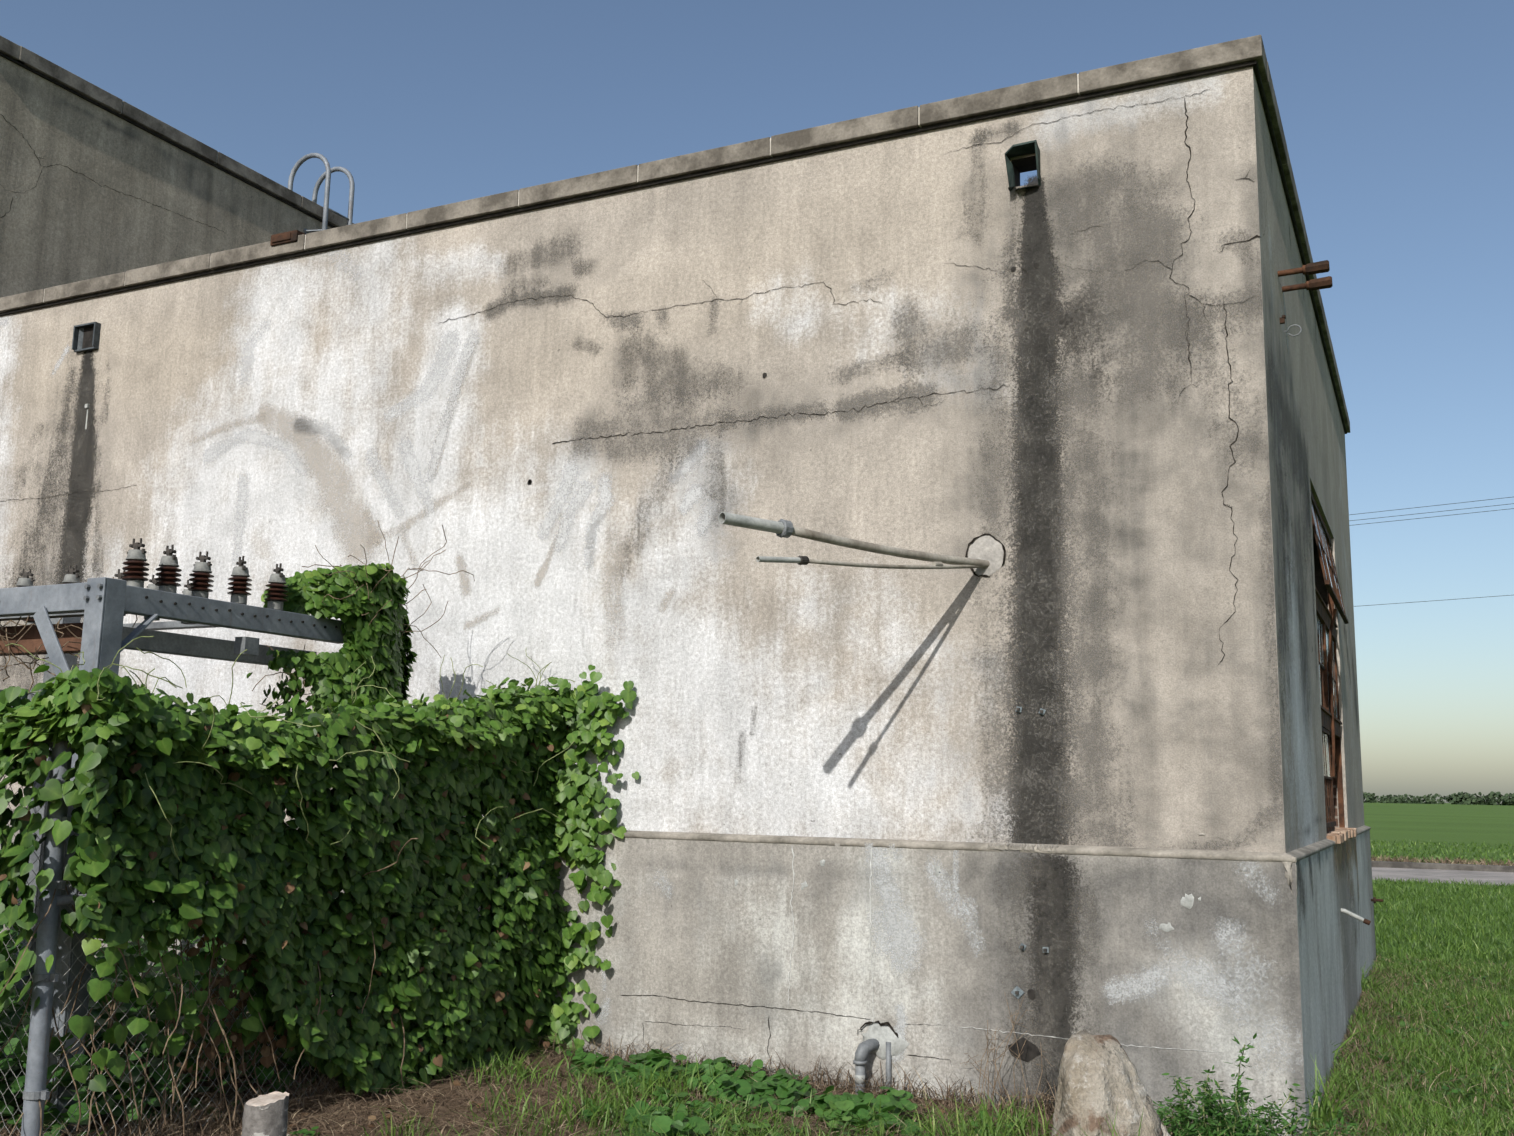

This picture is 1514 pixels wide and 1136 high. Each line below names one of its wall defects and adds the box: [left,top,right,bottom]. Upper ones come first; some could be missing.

crack [0,114,225,233]
damp [13,346,109,586]
damp [203,332,479,565]
crack [552,384,1009,444]
crack [956,89,1281,666]
damp [535,160,1264,1113]
damp [1192,486,1317,850]
damp [1297,853,1321,912]